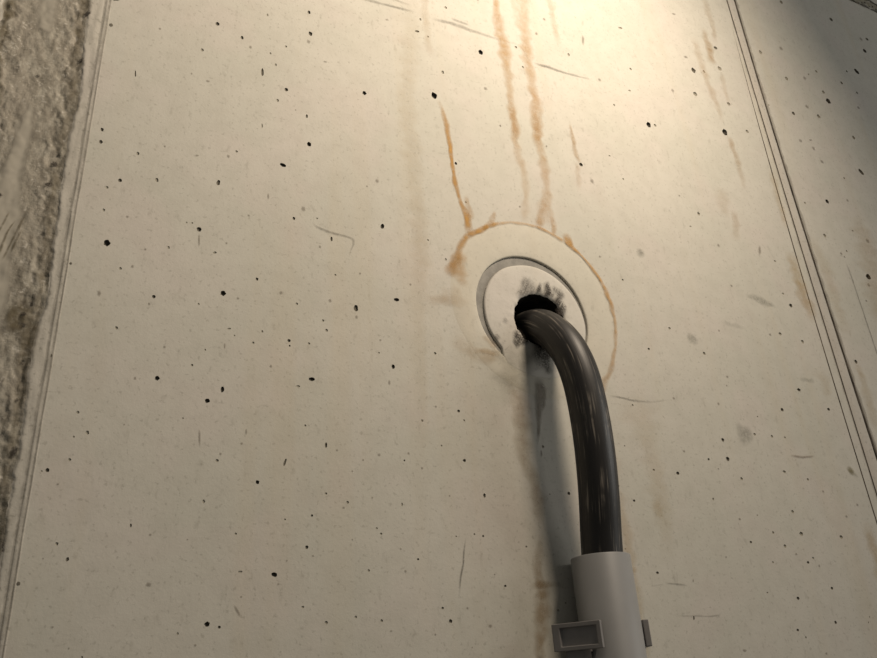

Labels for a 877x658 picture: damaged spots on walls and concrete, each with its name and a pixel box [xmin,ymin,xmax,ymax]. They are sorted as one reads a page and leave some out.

corrosion [445,120,497,266]
damp [538,283,565,315]
corrosion [566,238,614,316]